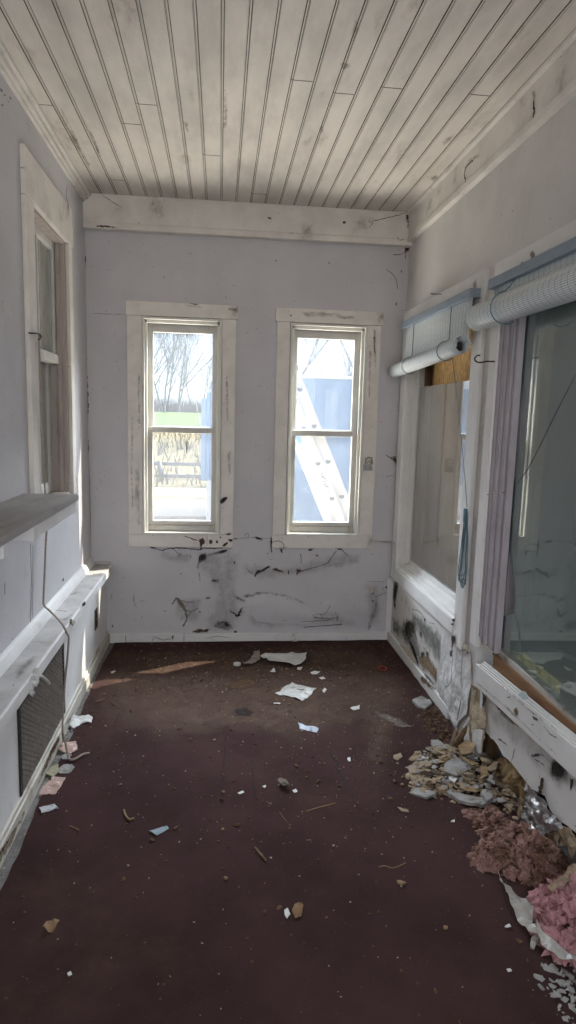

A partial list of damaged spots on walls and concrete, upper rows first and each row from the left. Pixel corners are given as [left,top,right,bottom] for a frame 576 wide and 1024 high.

water stain [412,609,440,659]
spalling [535,777,576,837]